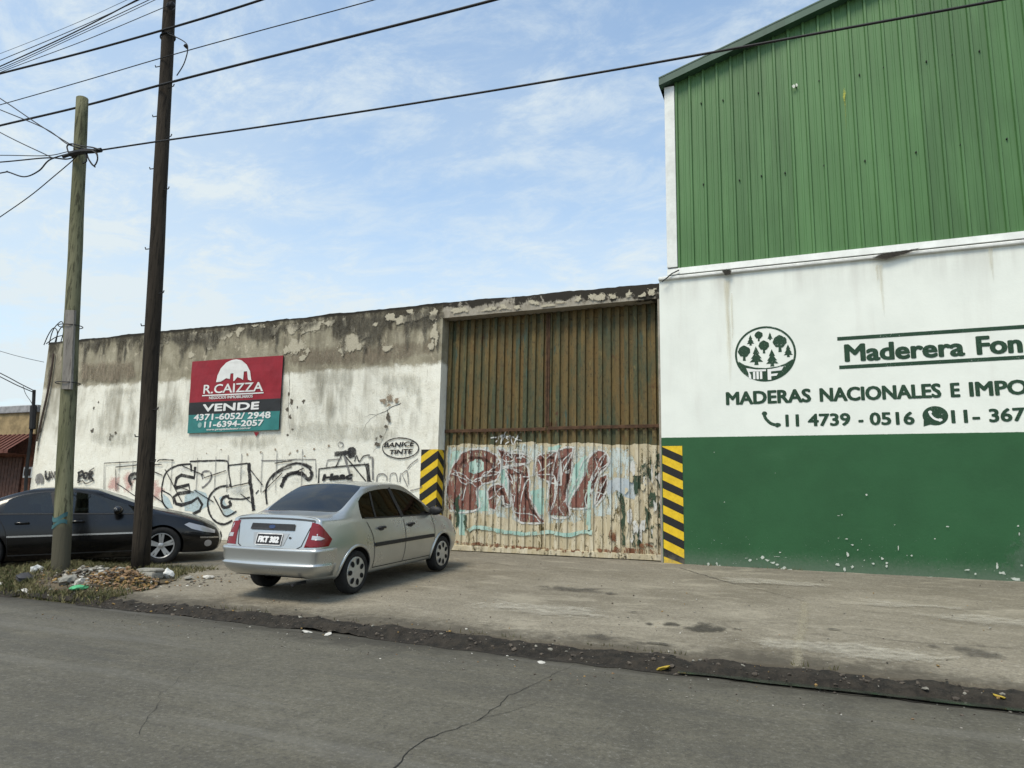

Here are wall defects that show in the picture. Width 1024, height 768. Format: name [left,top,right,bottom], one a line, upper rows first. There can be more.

leakage [160,331,226,357]
leakage [248,311,444,364]
peeling [186,288,656,361]
peeling [615,453,661,547]
rust [455,533,661,555]